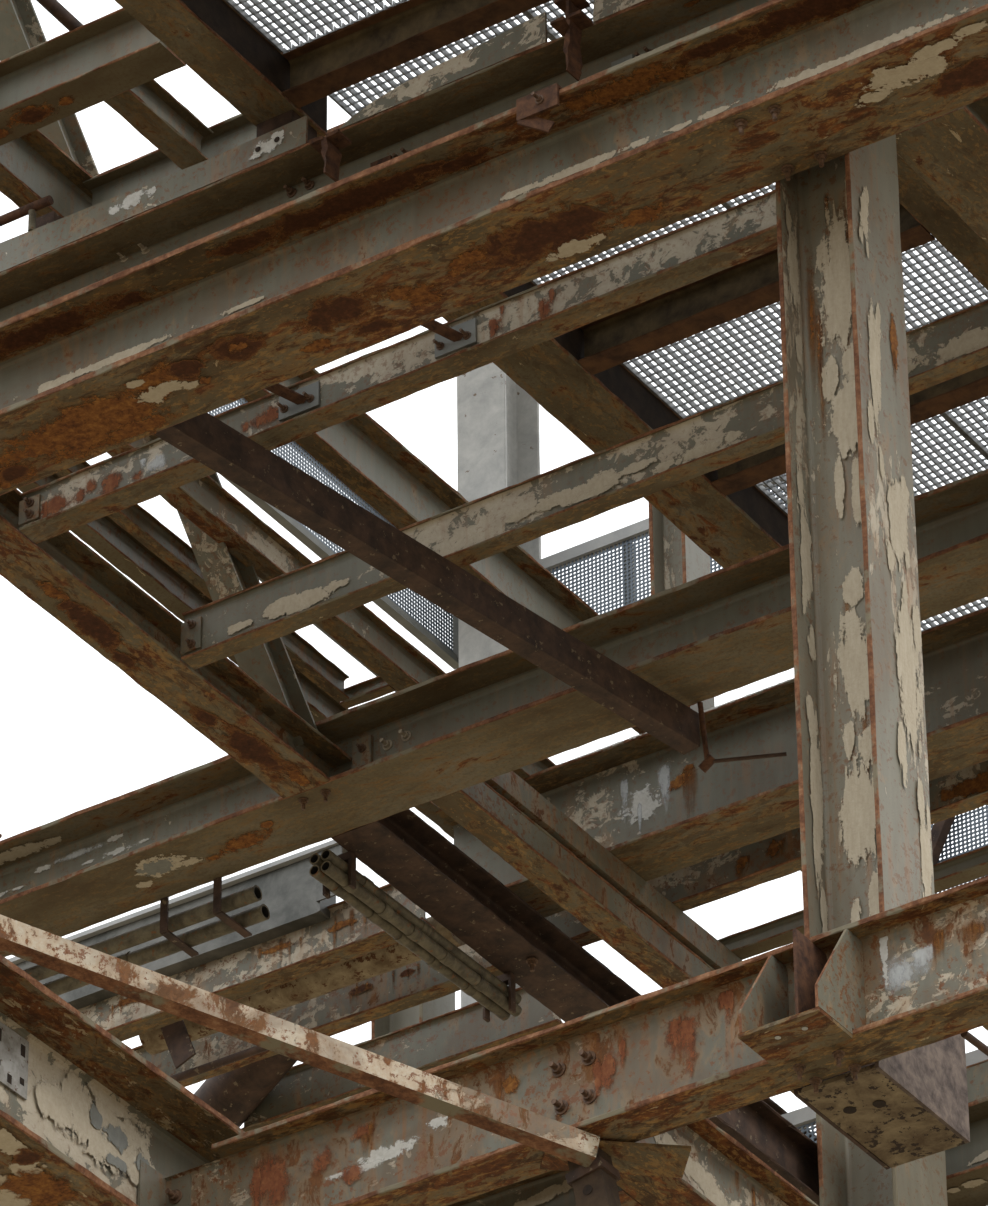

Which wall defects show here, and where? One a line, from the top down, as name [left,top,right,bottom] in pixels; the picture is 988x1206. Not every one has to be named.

corrosion [671,0,872,69]
peeling [766,5,988,108]
corrosion [205,143,495,258]
corrosion [446,194,665,273]
peeling [37,334,172,393]
corrosion [0,332,267,489]
peeling [786,185,933,933]
corrosion [36,581,141,672]
peeling [227,578,349,635]
peeling [0,1128,48,1206]
corrosion [0,1148,80,1206]
peeling [35,1068,156,1185]